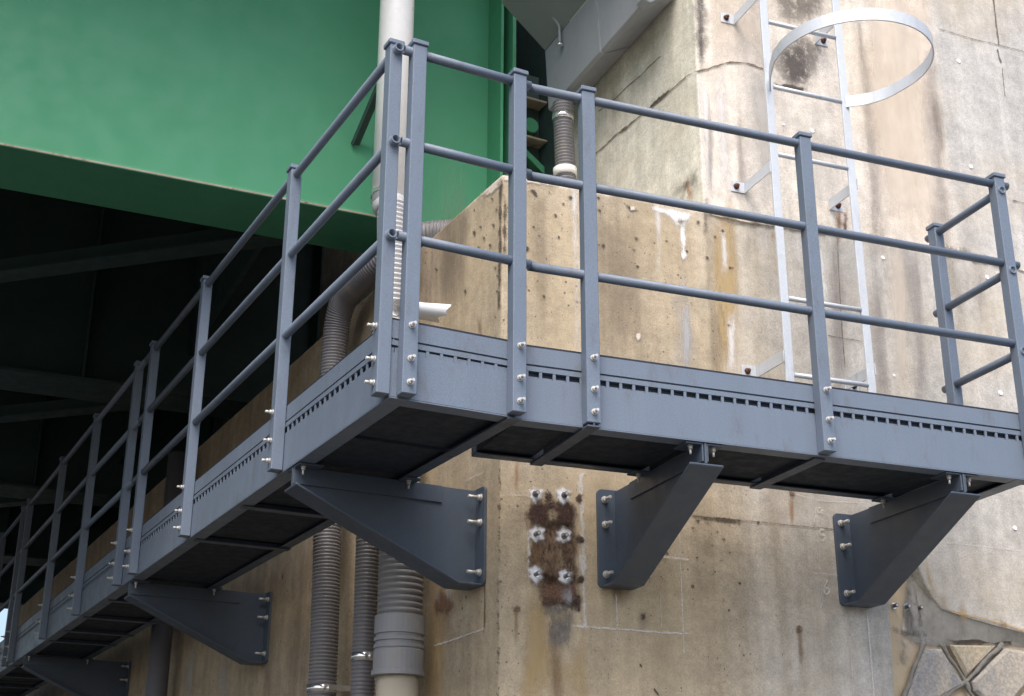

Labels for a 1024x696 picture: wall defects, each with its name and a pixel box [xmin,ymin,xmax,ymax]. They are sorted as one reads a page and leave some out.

crack [596,57,763,153]
damp [653,206,691,260]
rust [527,492,584,642]